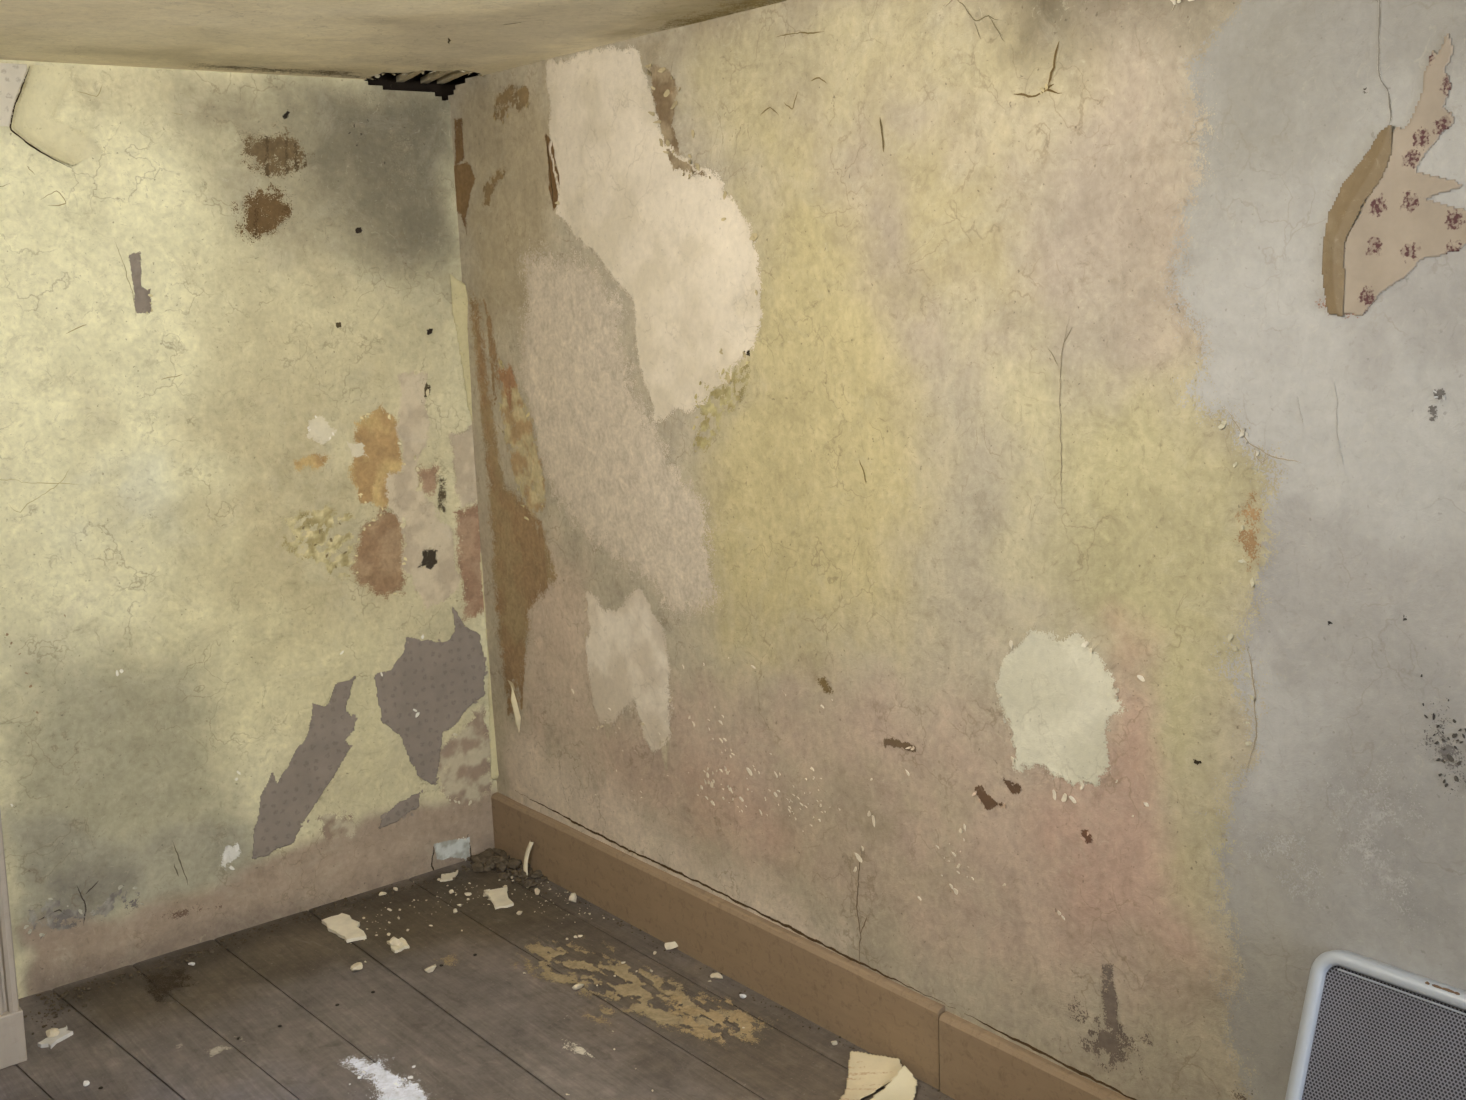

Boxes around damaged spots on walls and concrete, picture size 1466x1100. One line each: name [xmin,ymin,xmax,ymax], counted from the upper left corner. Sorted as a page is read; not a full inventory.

leakage [188,61,506,246]
leakage [493,85,529,125]
crack [946,0,1004,41]
crack [1014,42,1060,98]
peeling [129,251,153,315]
rust [498,364,517,412]
flaking render [498,44,841,832]
flaking render [279,275,521,808]
flaking render [1144,0,1466,1100]
flaking render [972,627,1128,810]
leakage [1194,698,1466,955]
leakage [1068,961,1156,1075]